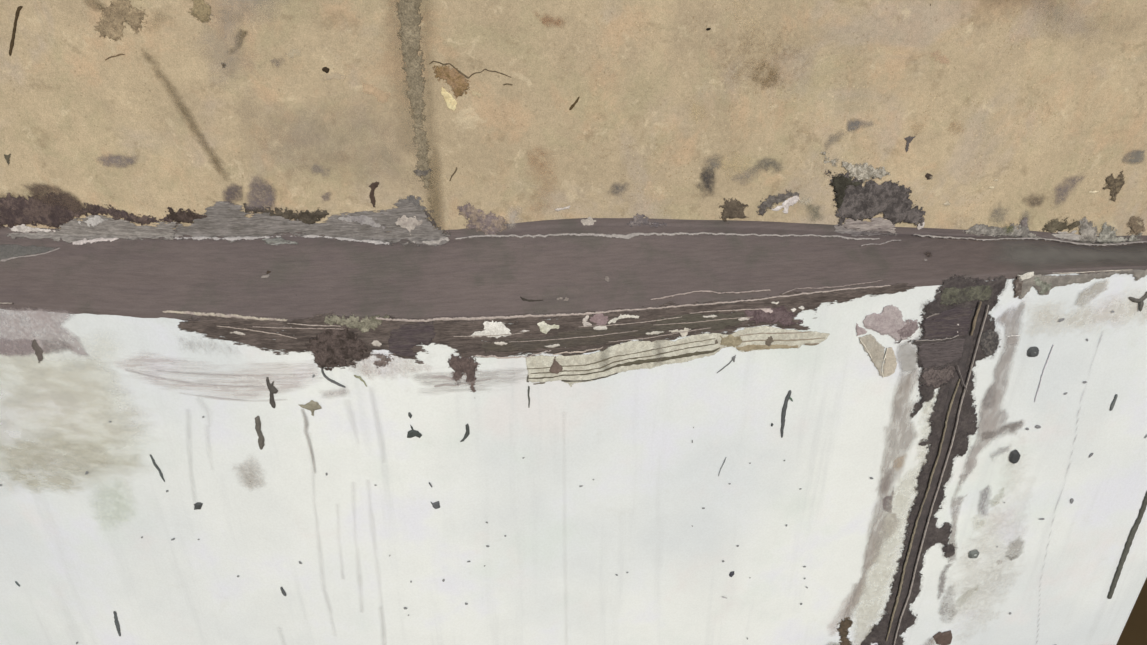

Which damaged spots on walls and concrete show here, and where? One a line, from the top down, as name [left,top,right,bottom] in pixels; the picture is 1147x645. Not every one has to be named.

spalling [821,152,926,236]
peeling [471,301,830,387]
peeling [859,334,897,377]